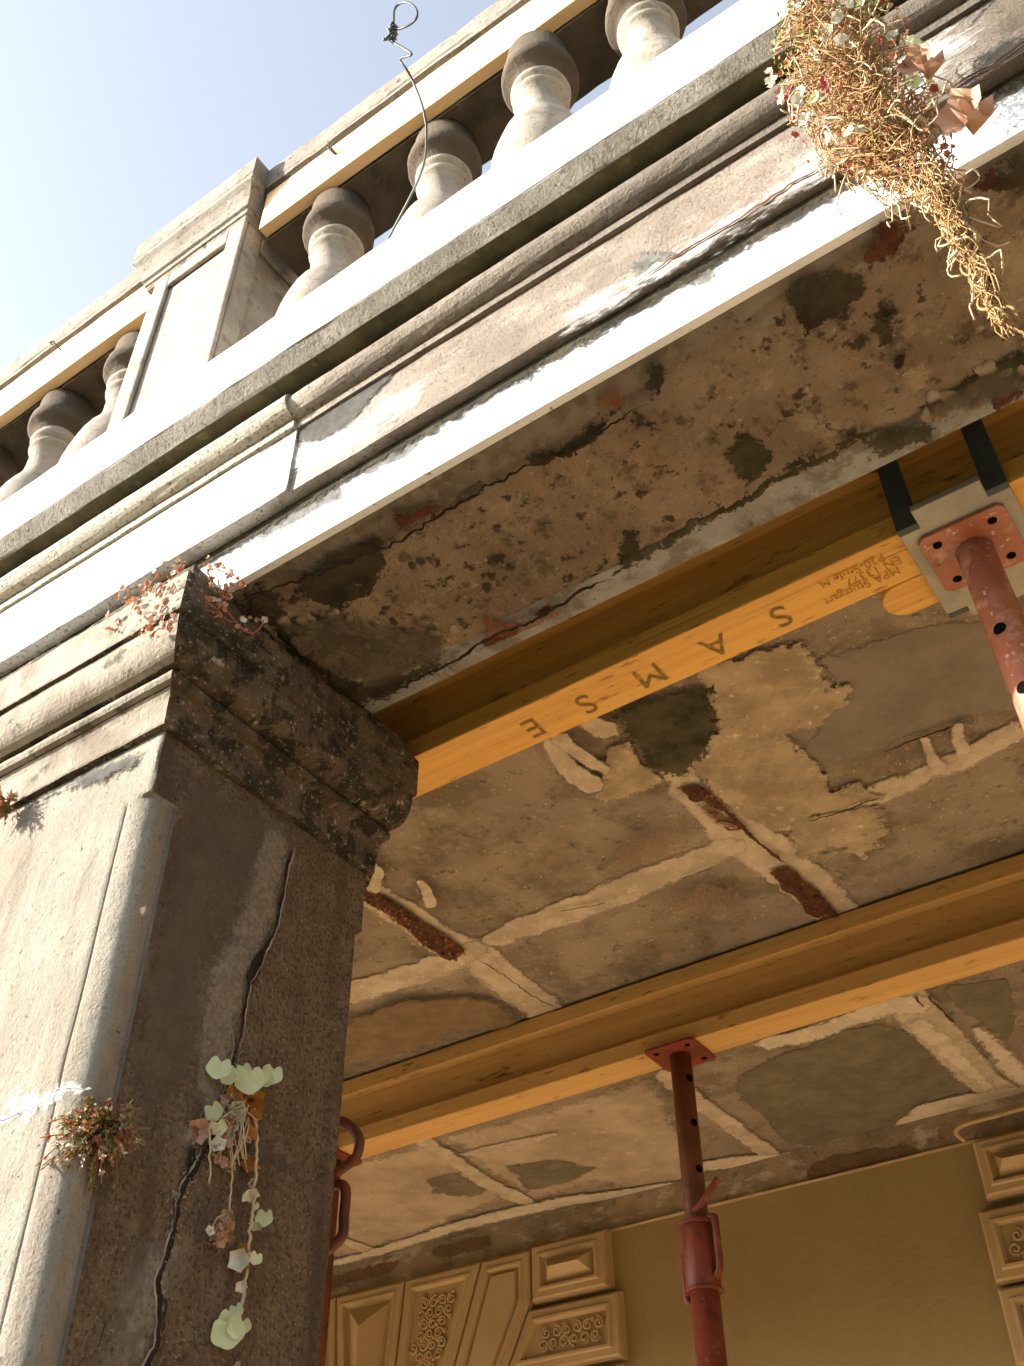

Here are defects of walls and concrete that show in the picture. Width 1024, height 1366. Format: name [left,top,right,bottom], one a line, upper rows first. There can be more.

crack [235,404,645,603]
crack [383,579,612,697]
crack [141,846,295,1366]